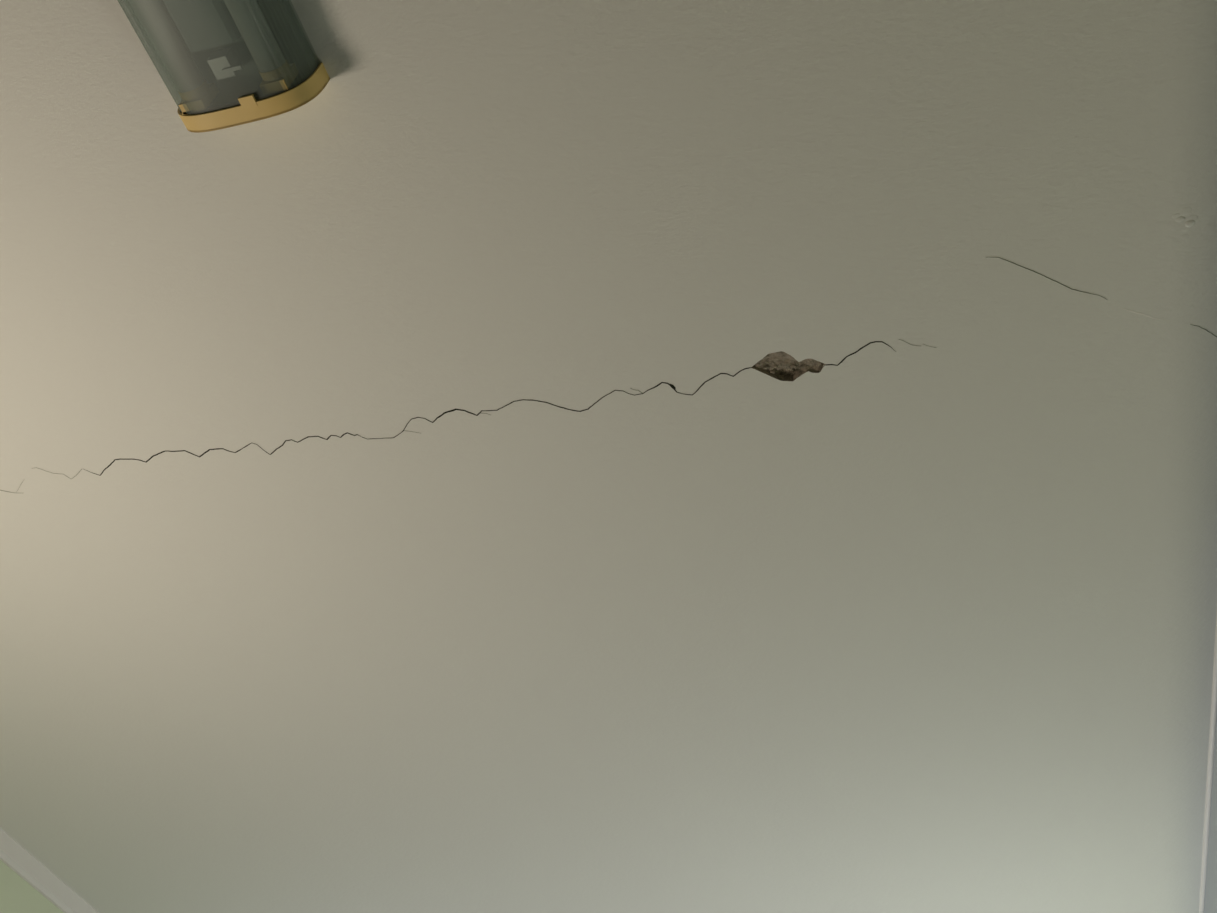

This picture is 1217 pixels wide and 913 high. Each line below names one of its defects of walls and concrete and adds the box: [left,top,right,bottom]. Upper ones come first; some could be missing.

flaking render [752,351,826,381]
crack [825,339,936,366]
crack [1,367,752,493]